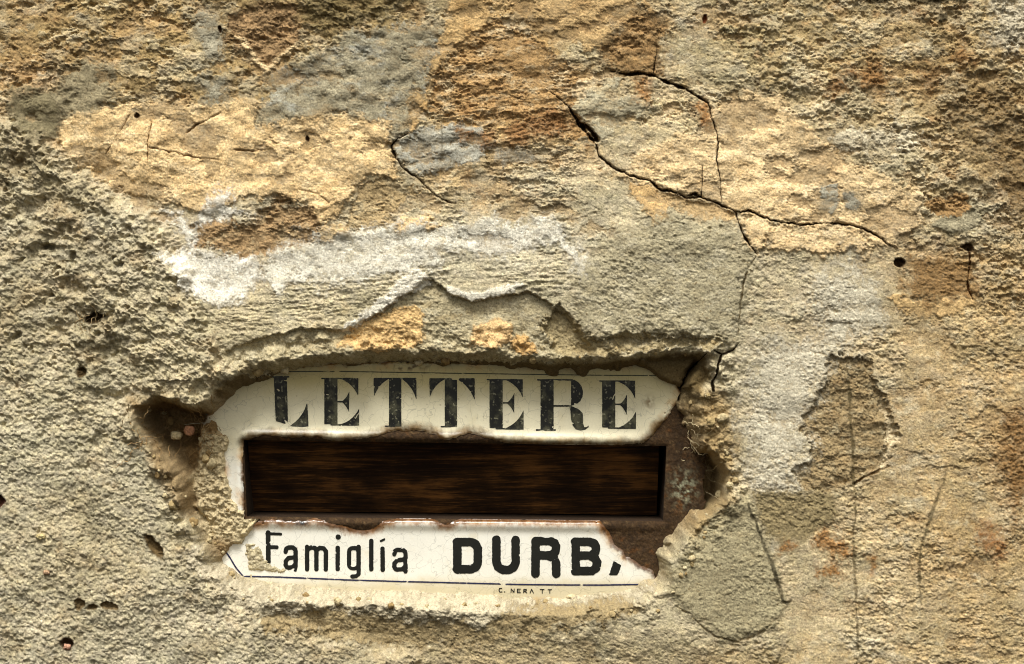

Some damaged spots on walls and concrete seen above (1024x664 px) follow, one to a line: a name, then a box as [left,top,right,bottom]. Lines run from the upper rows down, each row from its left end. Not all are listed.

flaking render [5,0,668,261]
leakage [159,187,591,332]
crack [391,134,455,204]
spalling [220,280,722,379]
crack [551,48,895,401]
crack [966,251,974,299]